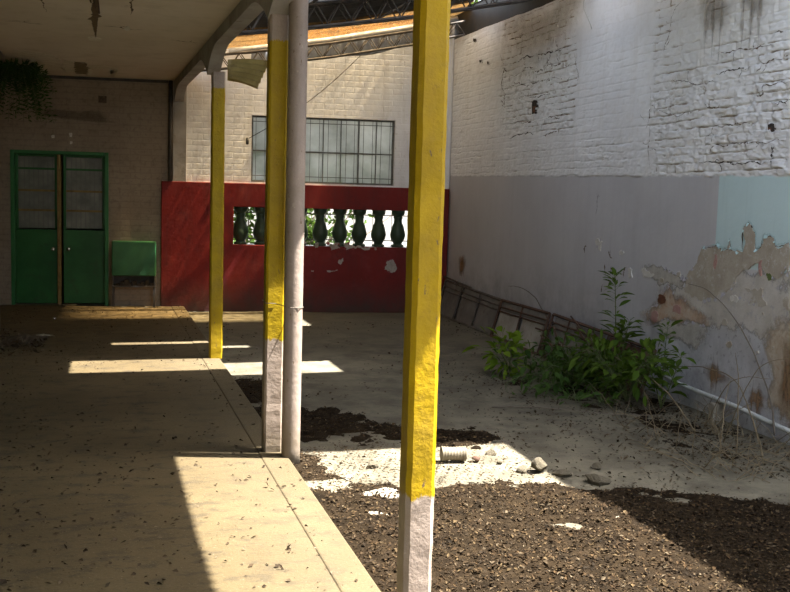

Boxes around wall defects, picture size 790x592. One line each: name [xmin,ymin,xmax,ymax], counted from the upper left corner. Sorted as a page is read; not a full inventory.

crack [501,37,578,139]
crack [673,30,790,105]
crack [640,96,781,171]
peeling [385,259,397,273]
peeling [644,220,790,428]